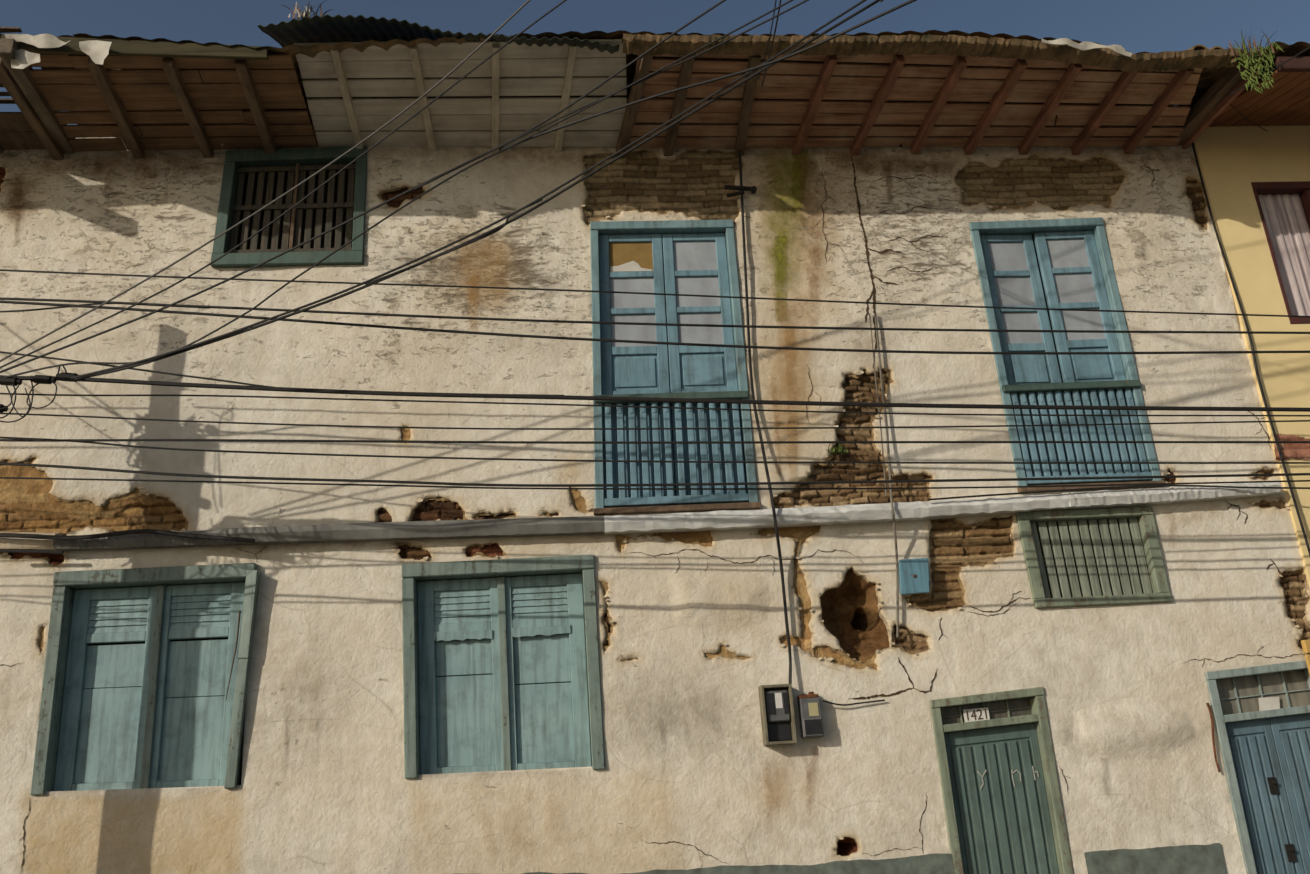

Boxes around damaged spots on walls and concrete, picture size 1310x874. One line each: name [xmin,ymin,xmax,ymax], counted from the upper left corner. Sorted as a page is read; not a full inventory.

flaking render [580,149,743,231]
flaking render [955,155,1125,211]
leakage [775,237,786,320]
crack [812,155,948,368]
flaking render [774,369,933,508]
flaking render [0,458,189,535]
crack [625,549,865,576]
spalling [758,525,929,670]
crack [850,591,1029,699]
flaking render [904,515,1015,612]
crack [1181,646,1305,666]
flaking render [1280,568,1310,649]